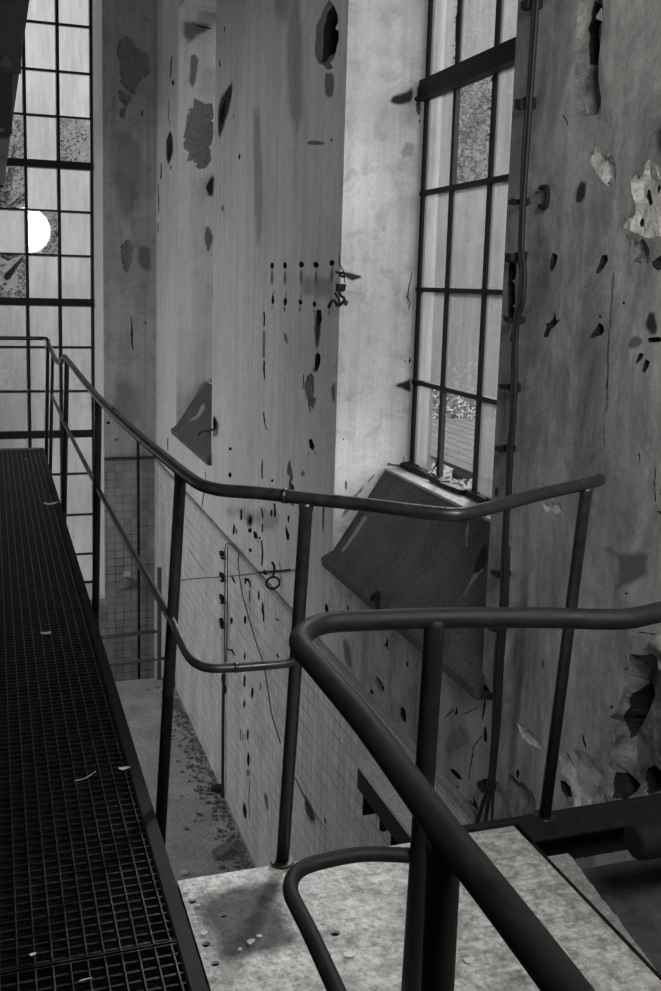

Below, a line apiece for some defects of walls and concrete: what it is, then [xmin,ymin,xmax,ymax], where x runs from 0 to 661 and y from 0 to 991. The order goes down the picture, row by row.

peeling [117,33,150,119]
spalling [315,0,339,97]
spalling [575,0,603,116]
peeling [166,83,234,170]
flaking render [591,147,617,187]
peeling [120,239,149,273]
spalling [596,255,608,274]
flaking render [623,159,661,270]
flaking render [556,654,661,808]